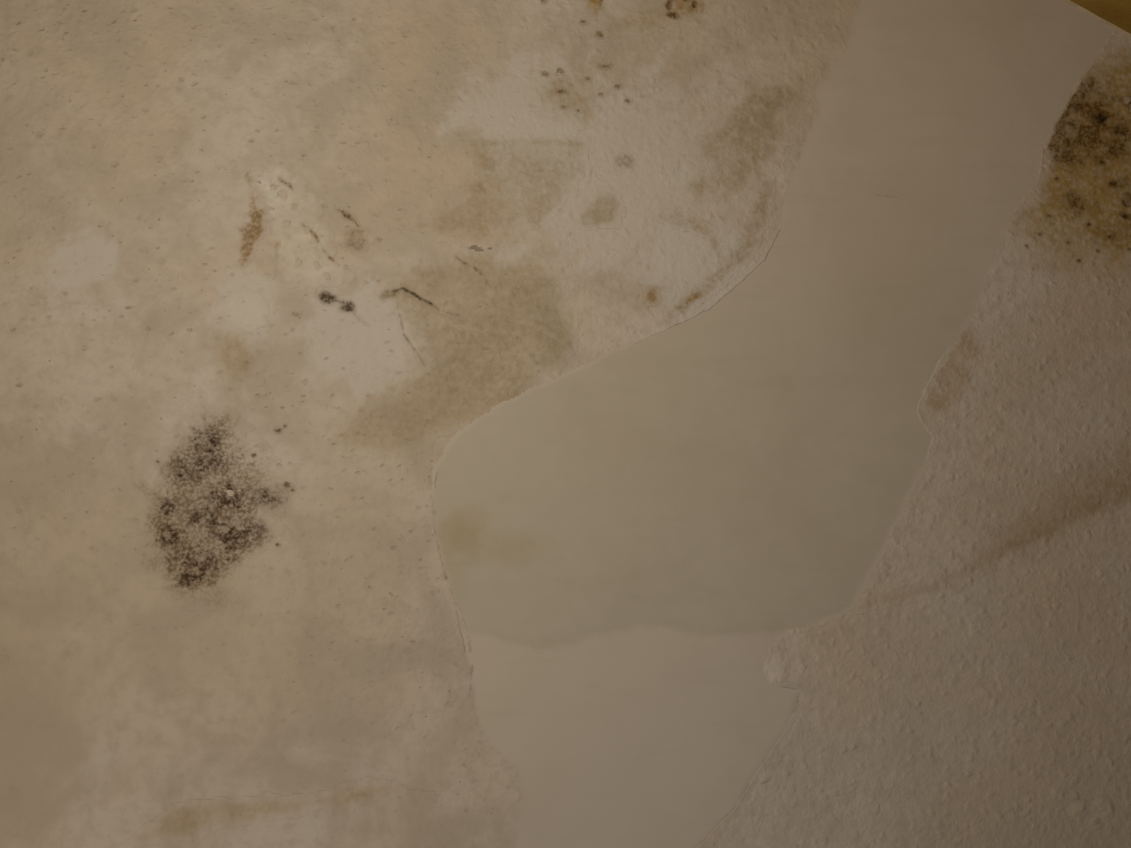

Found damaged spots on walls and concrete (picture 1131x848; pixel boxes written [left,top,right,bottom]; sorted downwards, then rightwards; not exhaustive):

mould [1000,41,1131,294]
leakage [195,323,274,388]
leakage [122,392,297,616]